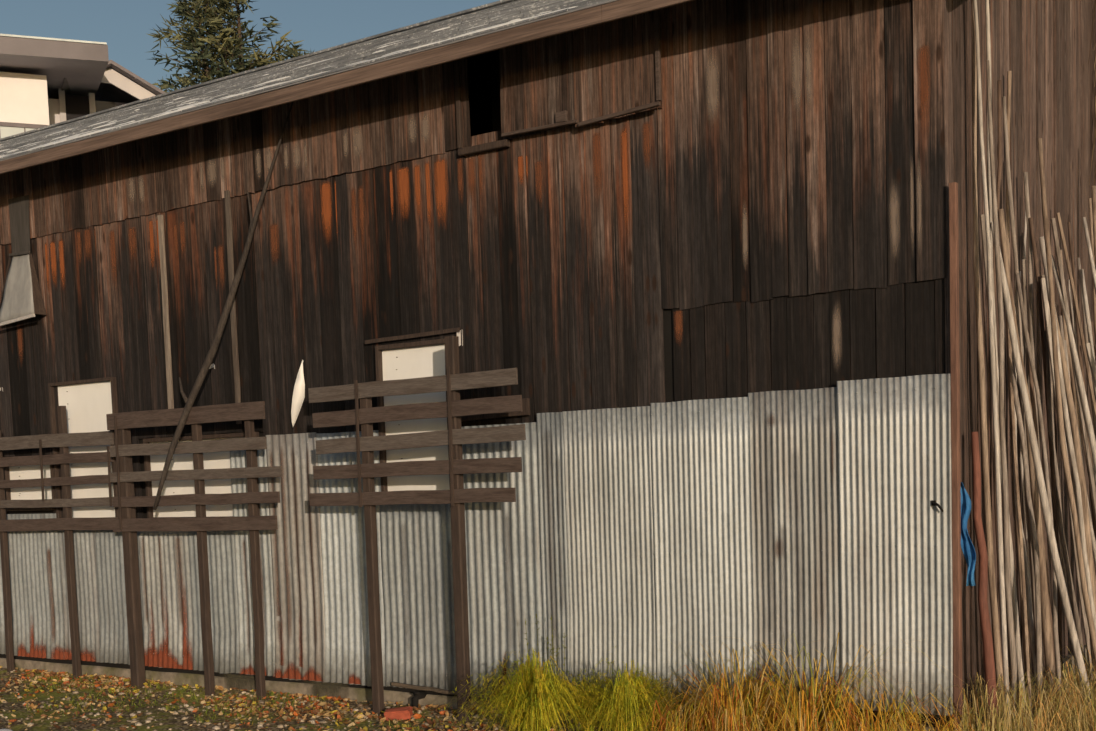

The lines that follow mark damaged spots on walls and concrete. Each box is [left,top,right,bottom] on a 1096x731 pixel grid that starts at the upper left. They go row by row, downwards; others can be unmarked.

corrosion [18,626,96,662]
corrosion [144,605,193,670]
corrosion [241,626,322,681]